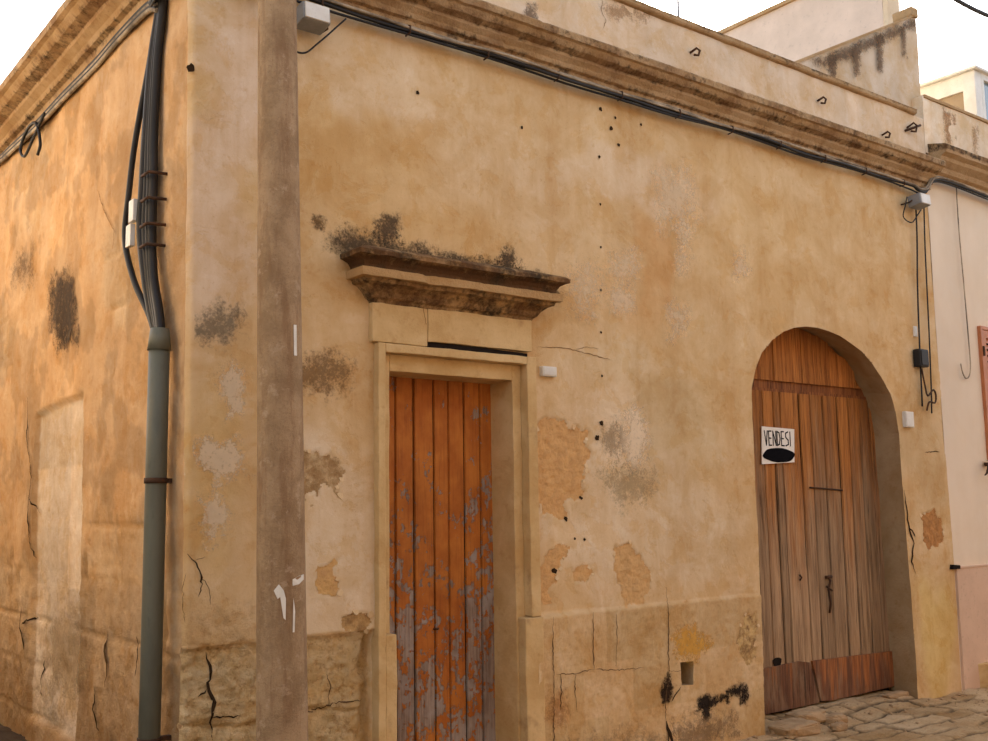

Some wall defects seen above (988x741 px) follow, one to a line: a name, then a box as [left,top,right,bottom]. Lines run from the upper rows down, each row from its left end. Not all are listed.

damp [312,214,520,269]
damp [48,269,79,351]
damp [195,302,245,344]
damp [302,350,350,395]
peeling [304,449,345,507]
peeling [537,417,603,522]
spalling [920,508,945,550]
crack [182,555,211,620]
peeling [315,558,343,596]
peeling [540,537,594,605]
peeling [612,540,653,608]
crack [198,654,238,740]